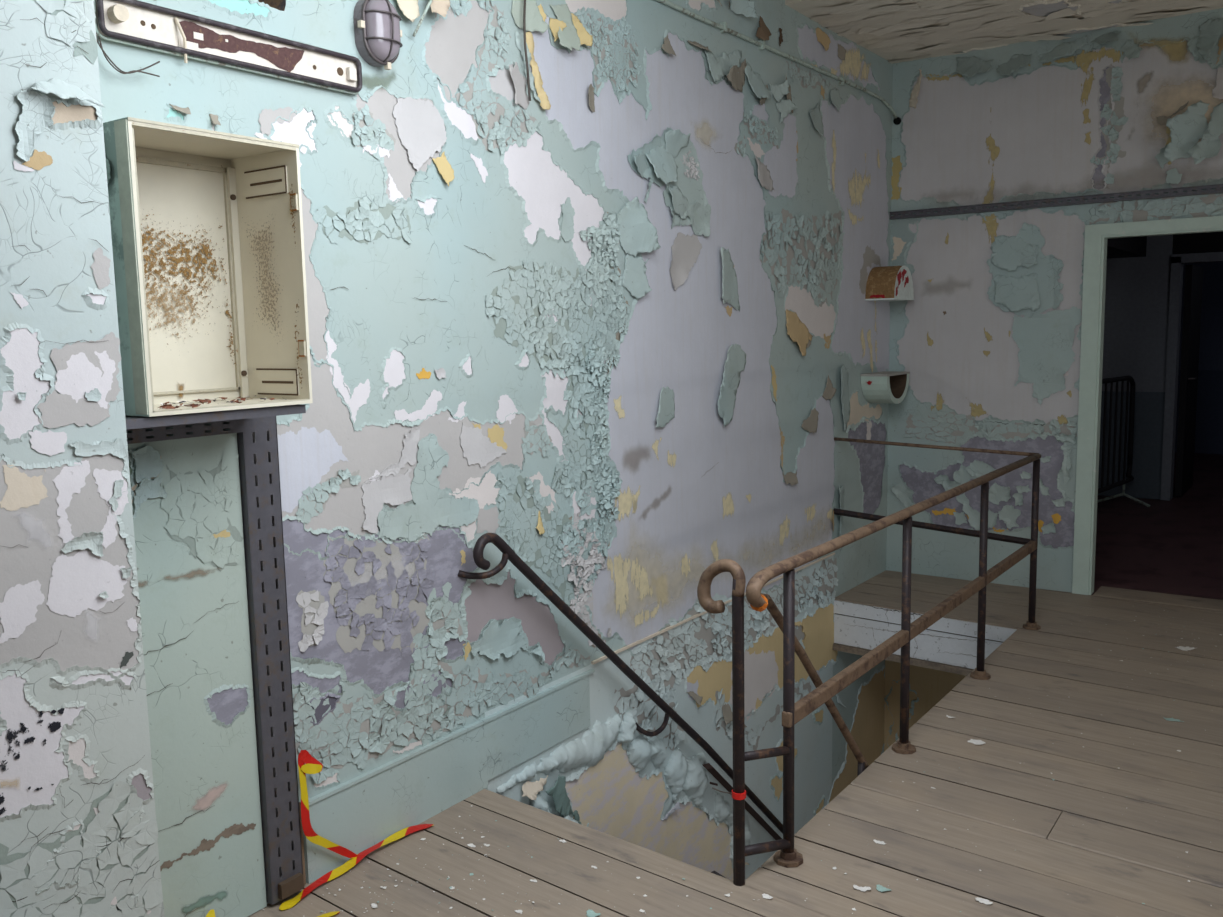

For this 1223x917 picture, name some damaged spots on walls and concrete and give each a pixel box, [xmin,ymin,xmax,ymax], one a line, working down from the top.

peeling [198,0,272,21]
peeling [13,78,104,172]
peeling [81,248,111,311]
peeling [254,0,1223,728]
peeling [0,322,167,690]
crack [161,451,244,572]
crack [146,601,239,655]
crack [0,755,165,917]
peeling [121,768,154,838]
spalling [565,740,750,881]
peeling [769,738,798,802]
peeling [813,665,919,816]